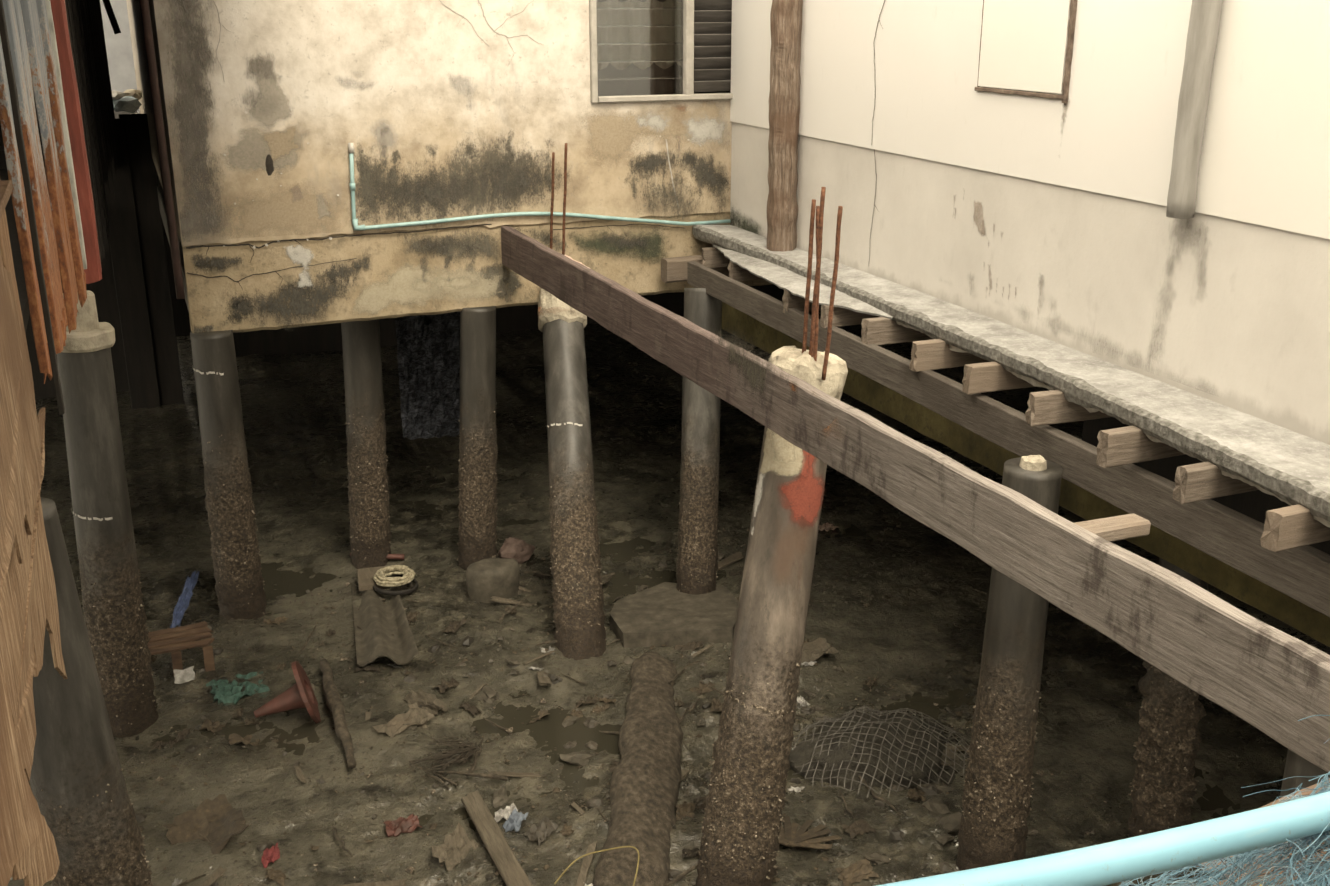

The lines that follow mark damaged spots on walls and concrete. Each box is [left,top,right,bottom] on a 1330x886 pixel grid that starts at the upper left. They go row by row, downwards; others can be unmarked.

crack [439,0,541,60]
crack [868,0,885,266]
water stain [228,245,370,329]
crack [186,224,492,290]
water stain [356,128,568,280]
mould [517,228,666,261]
mould [629,151,759,235]